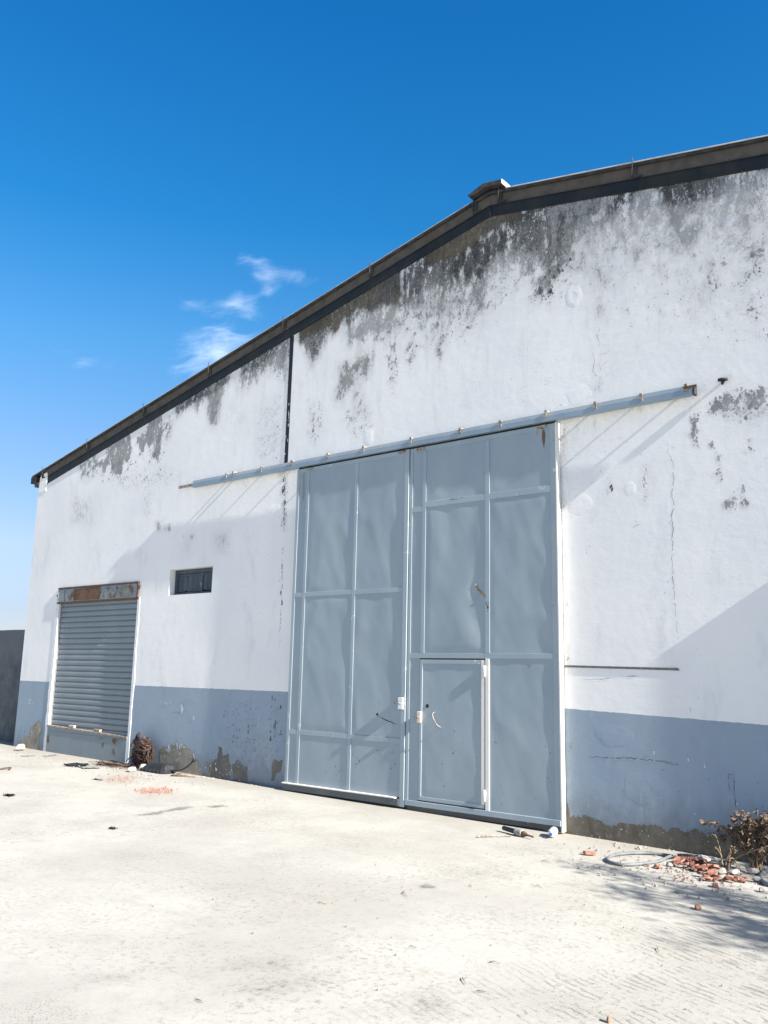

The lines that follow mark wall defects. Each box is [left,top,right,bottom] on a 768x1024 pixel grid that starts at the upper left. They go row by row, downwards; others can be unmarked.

leakage [176,168,768,425]
rust [64,585,134,601]
spalling [20,720,42,750]
spalling [159,698,286,781]
leakage [565,803,768,865]